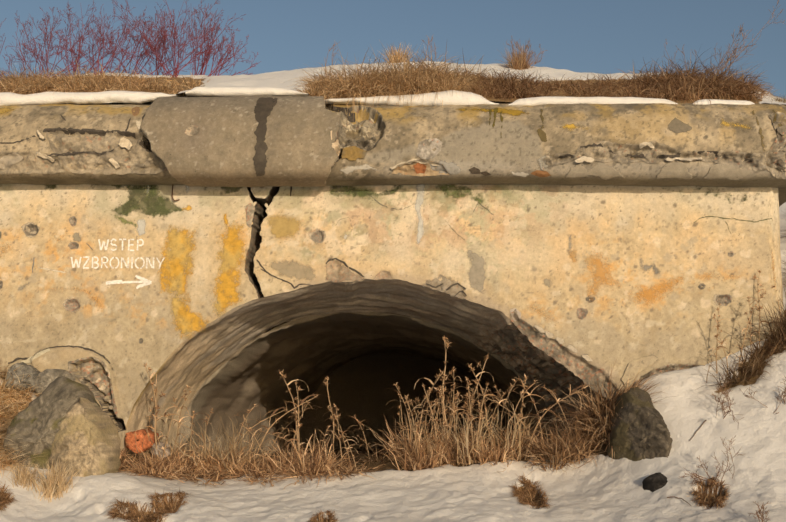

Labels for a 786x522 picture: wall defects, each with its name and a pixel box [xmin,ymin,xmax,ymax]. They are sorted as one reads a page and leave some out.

spalling [0,115,167,175]
damp [253,97,277,176]
spalling [330,105,386,174]
spalling [512,112,786,180]
crack [242,186,313,299]